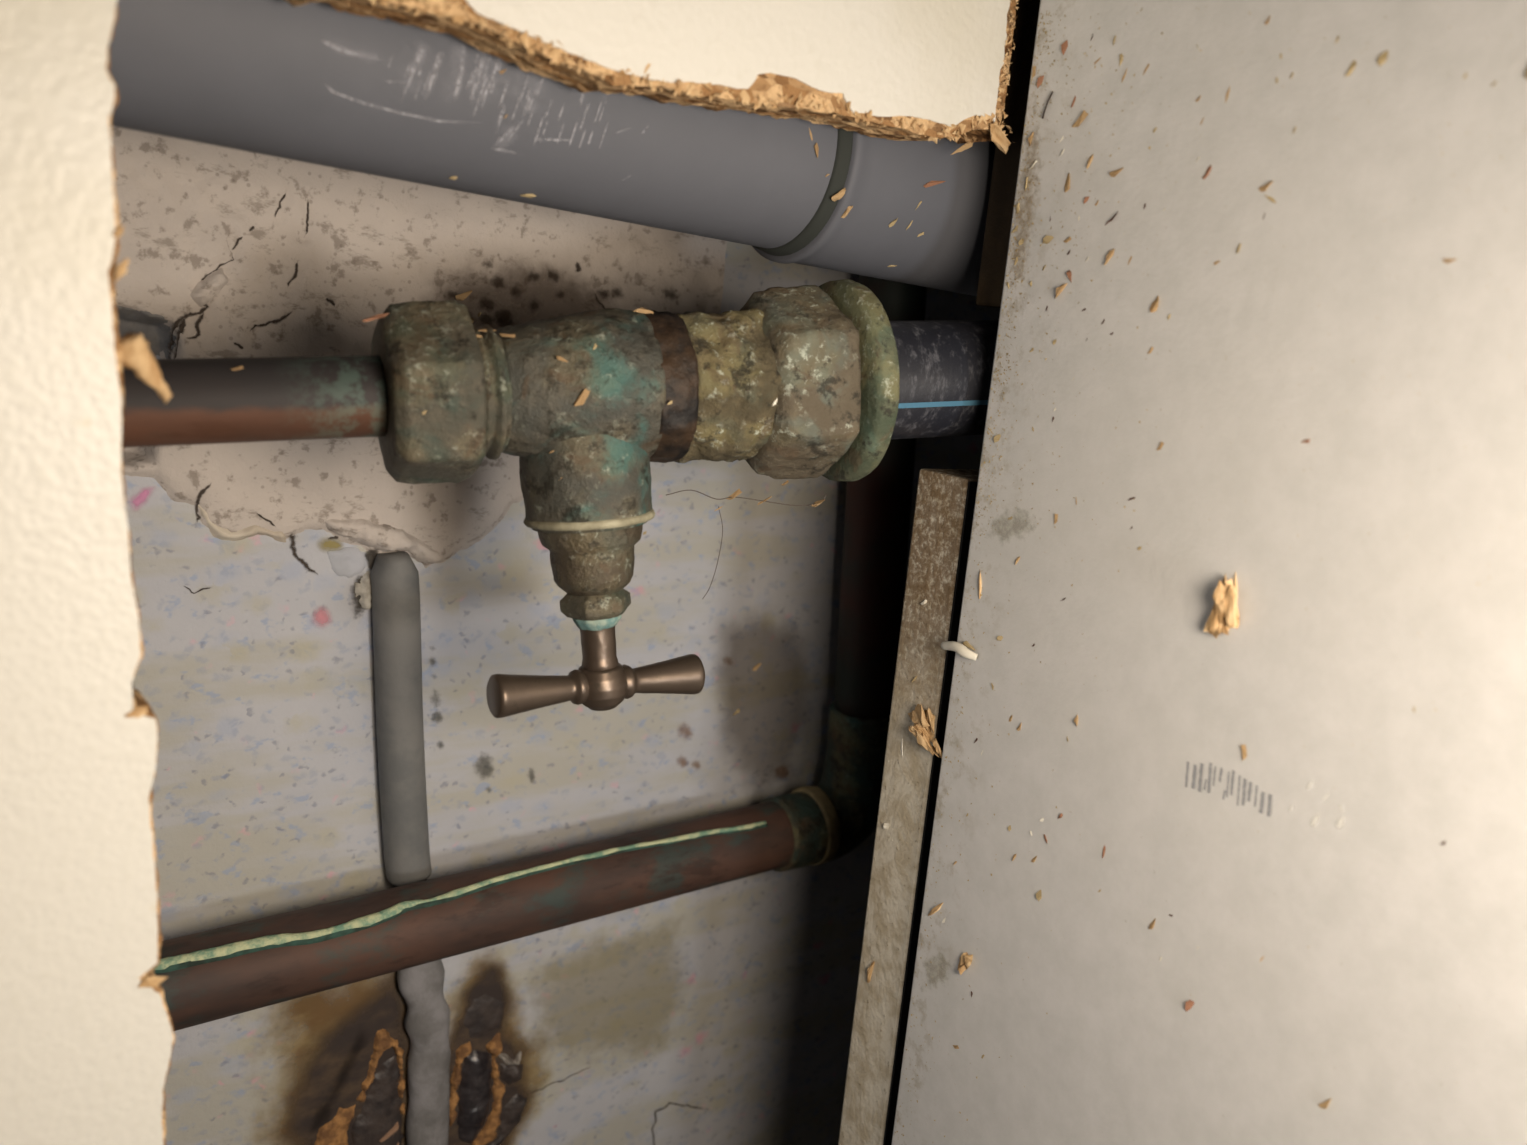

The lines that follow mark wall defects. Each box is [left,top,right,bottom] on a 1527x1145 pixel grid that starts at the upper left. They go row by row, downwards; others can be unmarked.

crack [168,194,309,358]